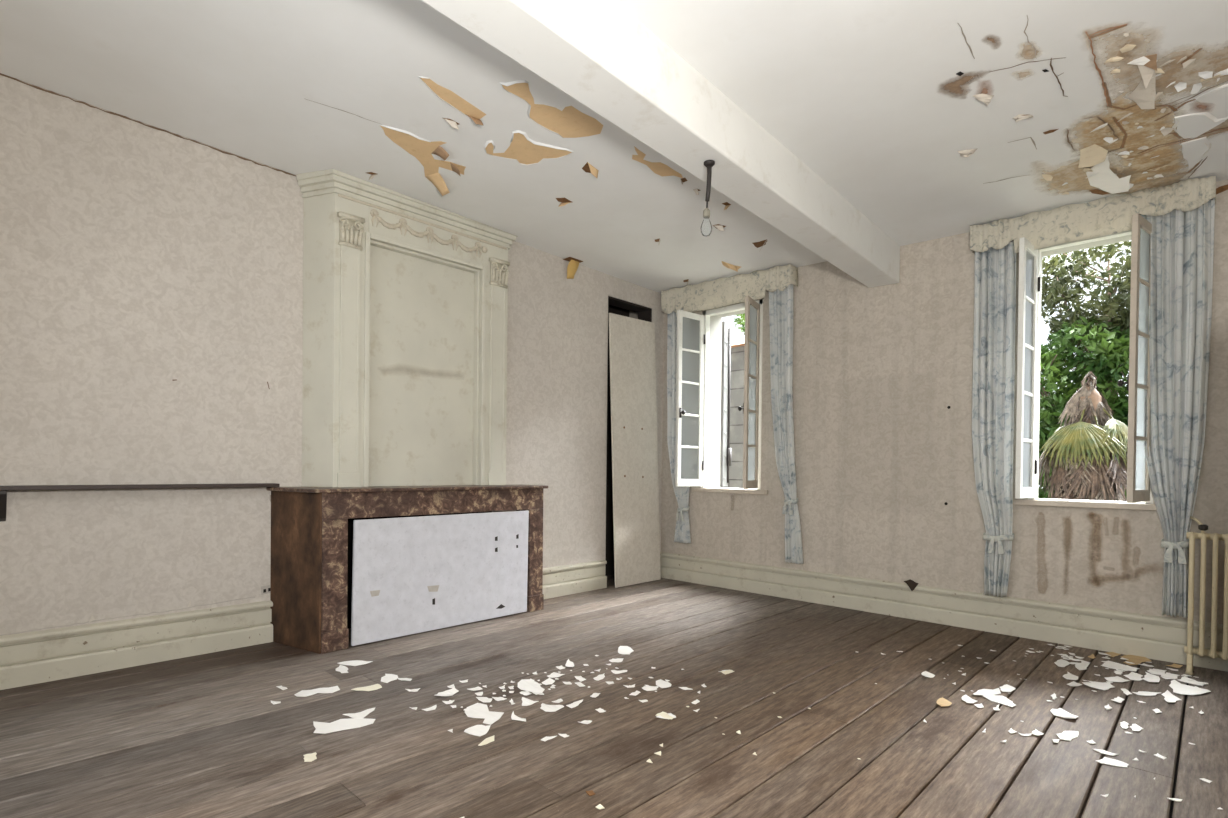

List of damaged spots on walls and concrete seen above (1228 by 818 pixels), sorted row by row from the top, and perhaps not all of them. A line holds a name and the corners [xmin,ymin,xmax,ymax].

peeling [379,124,466,196]
peeling [418,76,486,130]
peeling [484,80,603,166]
peeling [632,146,701,195]
peeling [1172,84,1228,170]